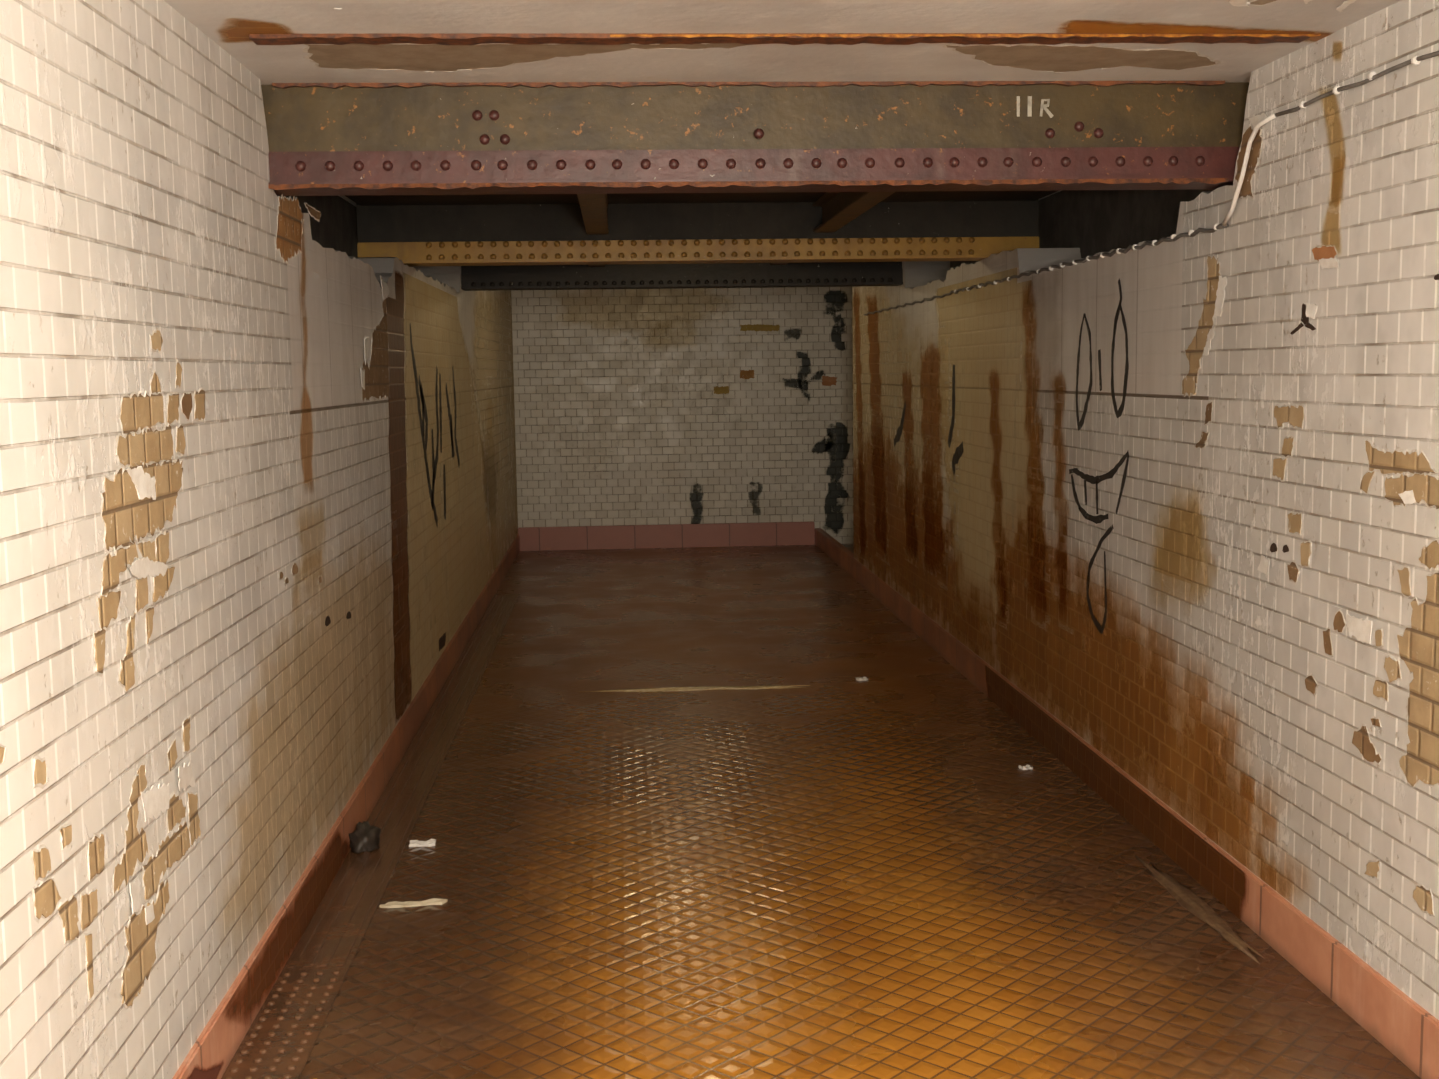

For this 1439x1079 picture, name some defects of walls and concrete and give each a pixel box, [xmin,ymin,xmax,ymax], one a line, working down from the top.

rust [610,21,1331,41]
rust [272,81,1225,89]
rust [268,178,1229,190]
spalling [1311,244,1340,269]
peeling [149,327,163,353]
peeling [1272,403,1305,482]
peeling [1360,439,1439,510]
peeling [93,359,205,693]
peeling [1257,511,1312,584]
peeling [1305,673,1319,697]
peeling [1323,539,1439,788]
peeling [31,715,201,1009]